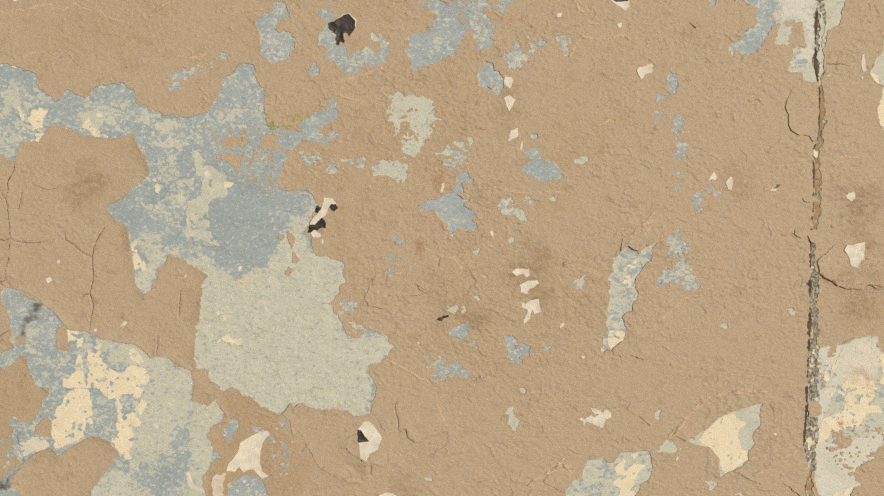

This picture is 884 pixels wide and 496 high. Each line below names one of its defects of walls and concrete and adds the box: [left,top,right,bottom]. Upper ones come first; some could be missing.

peeling [255,1,296,64]
peeling [310,7,391,76]
peeling [405,0,572,95]
peeling [729,0,845,142]
peeling [870,48,884,130]
peeling [419,137,478,237]
peeling [522,134,567,182]
peeling [0,63,443,496]
peeling [601,222,704,352]
crack [803,0,844,496]
peeling [566,404,762,496]
peeling [808,336,884,496]